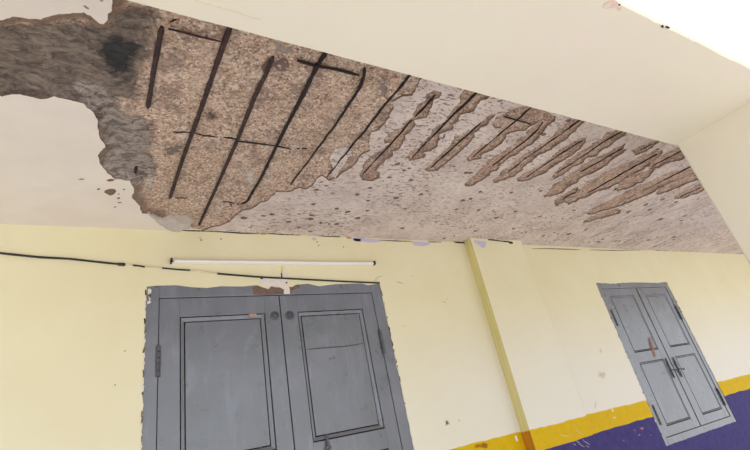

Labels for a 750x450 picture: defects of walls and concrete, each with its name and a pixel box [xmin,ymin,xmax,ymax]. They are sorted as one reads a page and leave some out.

damp [99,36,140,80]
spalling [0,0,743,254]
peeling [253,284,300,295]